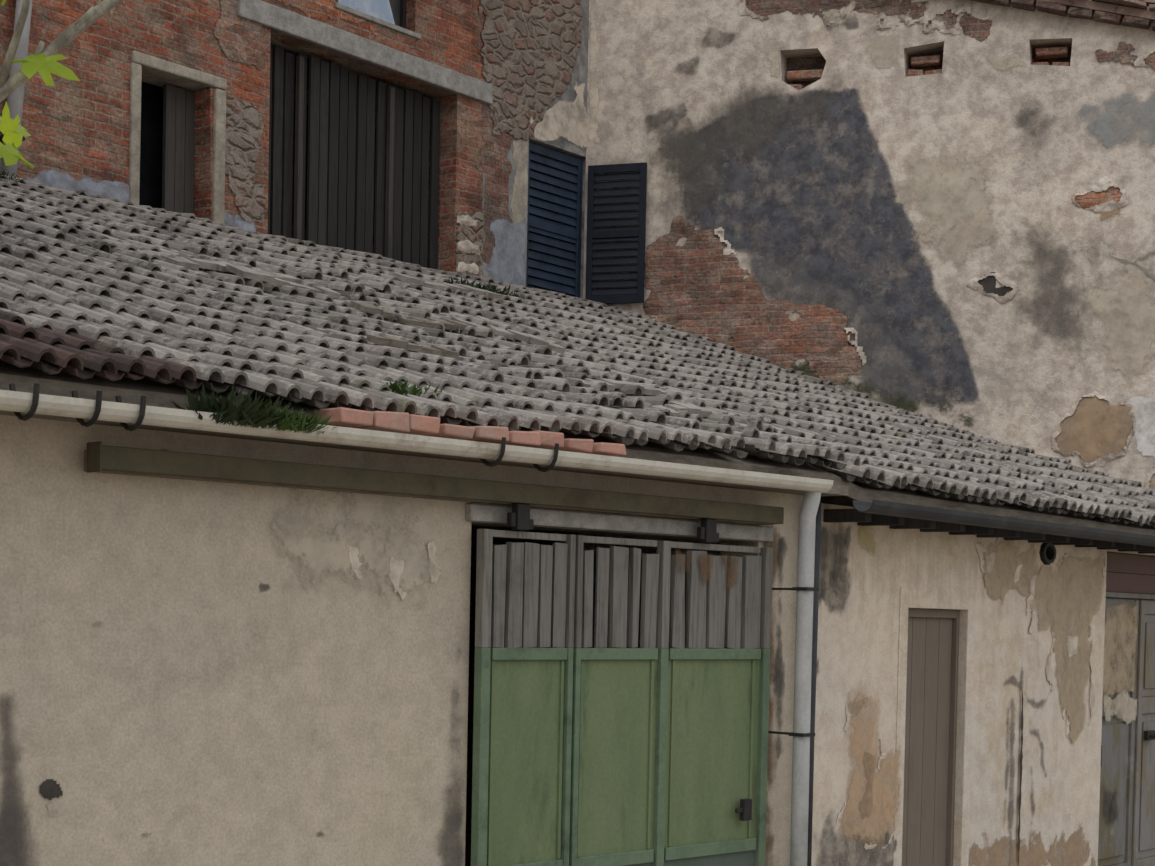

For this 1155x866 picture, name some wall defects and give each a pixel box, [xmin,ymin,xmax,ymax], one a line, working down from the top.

flaking render [767,41,784,77]
flaking render [738,0,992,68]
flaking render [647,104,685,127]
spalling [1071,176,1129,220]
spalling [643,216,866,385]
spalling [966,272,1019,304]
flaking render [1026,234,1078,338]
spalling [1050,391,1136,468]
damp [819,526,875,609]
peeling [974,537,1137,743]
peeling [836,697,900,850]